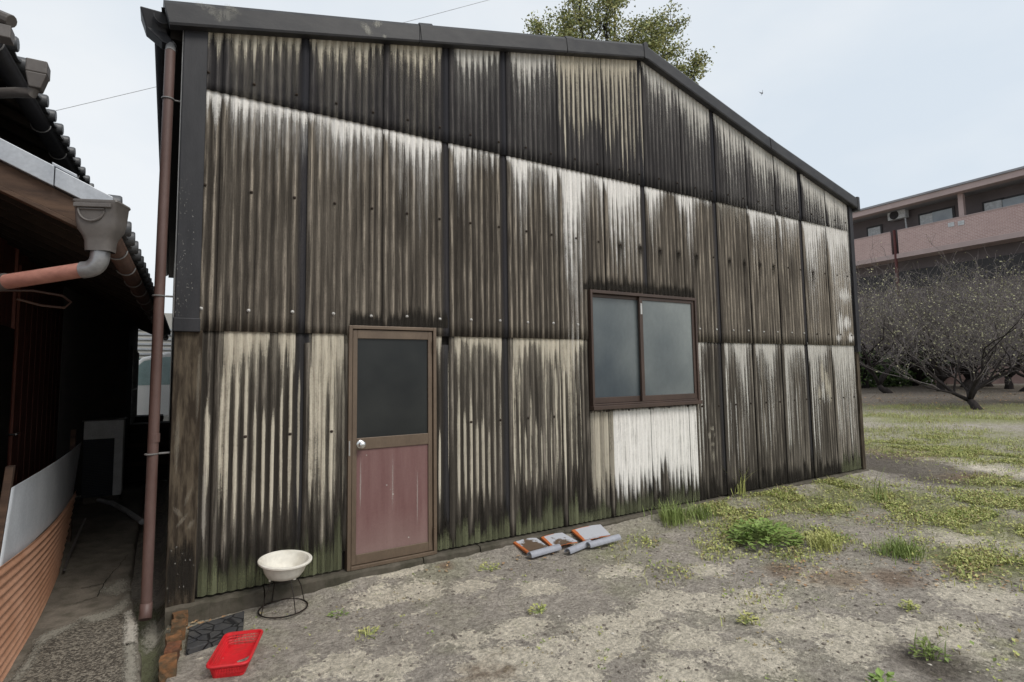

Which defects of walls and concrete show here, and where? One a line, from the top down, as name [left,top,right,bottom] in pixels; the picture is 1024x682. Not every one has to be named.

leakage [206,32,849,278]
leakage [583,278,694,298]
leakage [122,309,862,682]